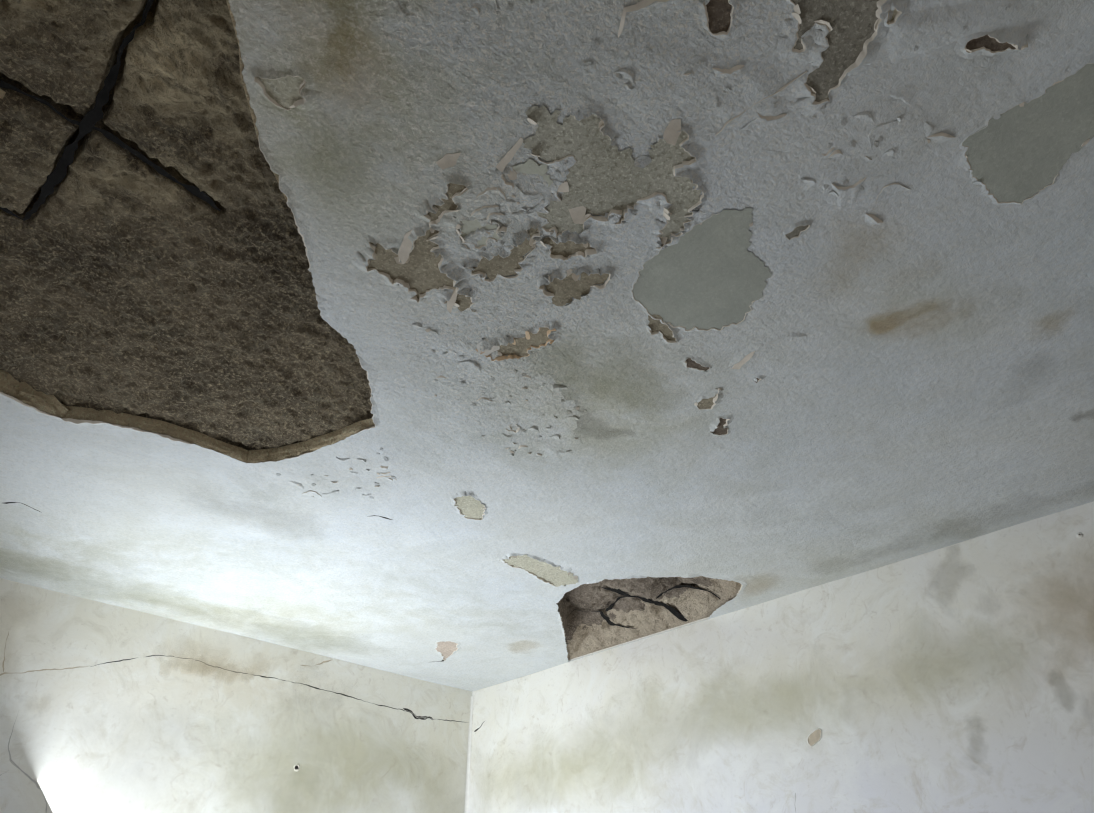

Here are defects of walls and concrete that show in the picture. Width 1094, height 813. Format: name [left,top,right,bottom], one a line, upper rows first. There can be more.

peeling [697,0,748,41]
peeling [776,0,910,116]
peeling [953,26,1029,59]
peeling [957,54,1094,206]
spalling [0,0,380,463]
peeling [351,97,772,344]
peeling [476,319,562,361]
peeling [681,356,712,372]
peeling [694,388,734,436]
spalling [497,553,749,660]
crack [0,632,485,733]
crack [0,711,48,813]